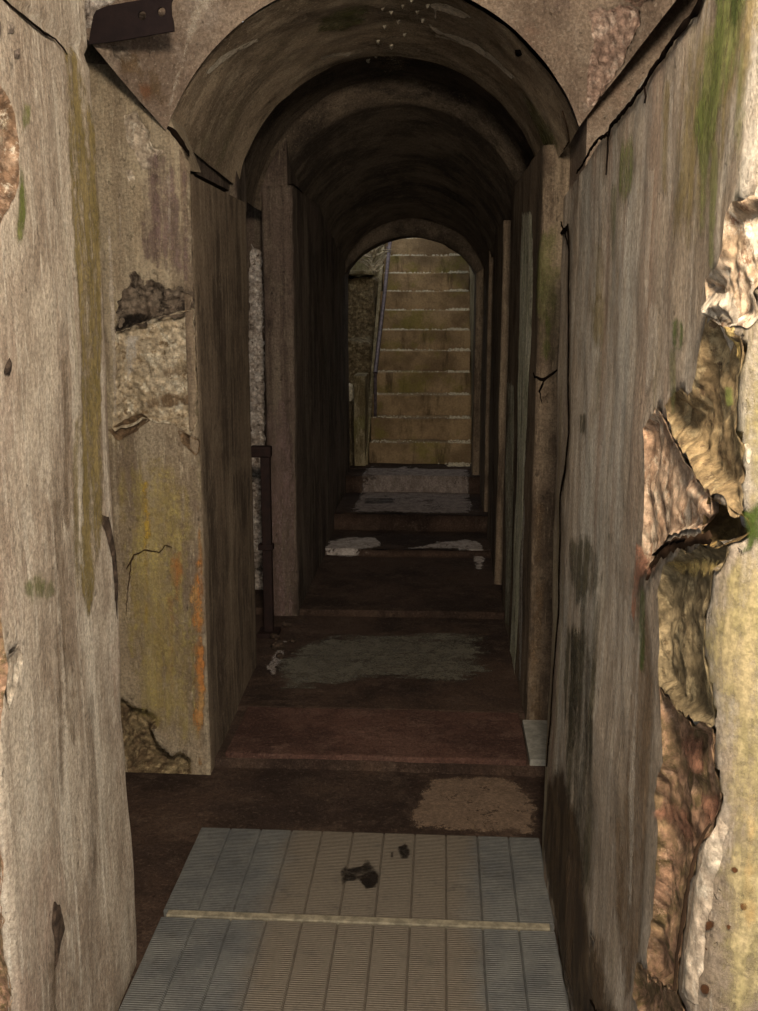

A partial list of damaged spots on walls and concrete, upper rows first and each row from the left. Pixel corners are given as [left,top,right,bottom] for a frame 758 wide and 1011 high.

spalling [0,86,20,223]
crack [3,0,68,55]
crack [562,0,702,175]
spalling [108,271,200,456]
damp [510,212,548,720]
crack [126,545,172,612]
rust [190,560,206,732]
damp [569,535,603,603]
spalling [631,186,758,1011]
spalling [120,699,192,774]
damp [544,626,613,1011]
damp [615,590,652,992]